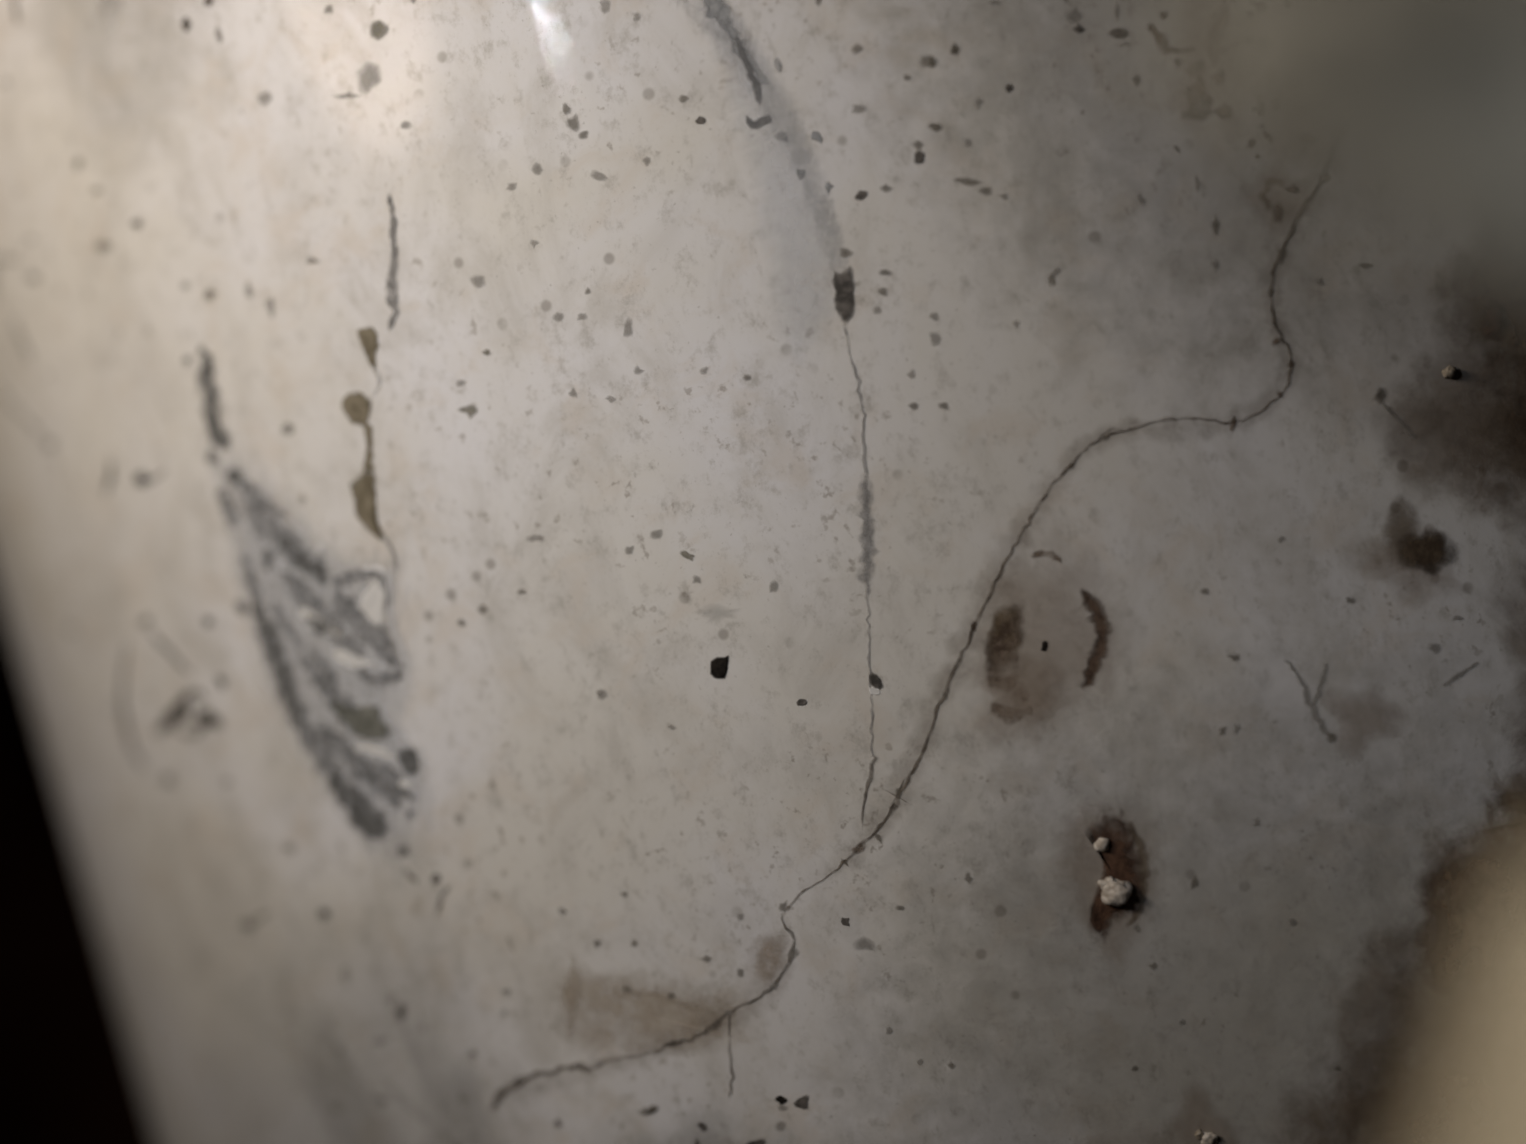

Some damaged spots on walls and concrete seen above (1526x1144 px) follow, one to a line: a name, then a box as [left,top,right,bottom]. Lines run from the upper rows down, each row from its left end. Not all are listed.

crack [493,196,1313,1107]
corrosion [987,610,1032,720]
corrosion [1082,590,1109,687]